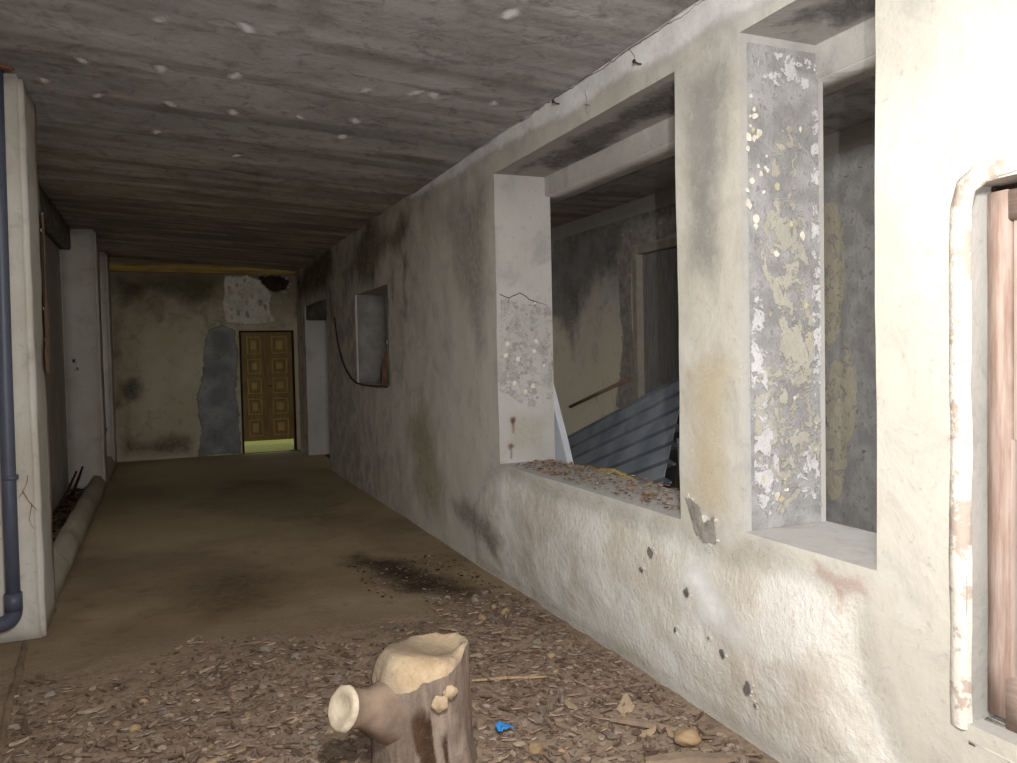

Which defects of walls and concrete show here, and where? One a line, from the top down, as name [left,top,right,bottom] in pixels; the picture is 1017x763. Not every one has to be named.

peeling [222,274,292,325]
peeling [498,299,553,407]
leakage [551,203,676,326]
peeling [745,42,877,533]
crack [18,475,38,527]
flaking render [685,493,720,547]